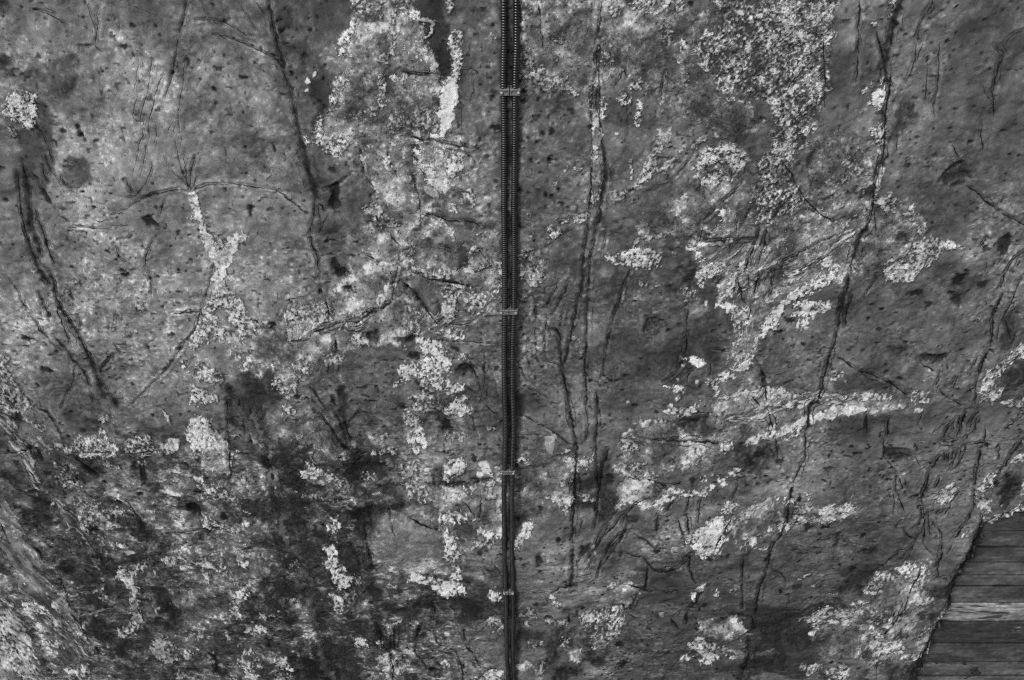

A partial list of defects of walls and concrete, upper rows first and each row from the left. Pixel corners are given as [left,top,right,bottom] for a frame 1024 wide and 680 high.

water stain [429,29,463,140]
water stain [615,78,650,127]
water stain [696,0,841,162]
crack [8,2,717,628]
water stain [604,89,966,483]
crack [642,0,1024,674]
crack [0,445,42,458]
water stain [0,189,641,680]
water stain [685,491,860,560]
crack [61,581,99,655]